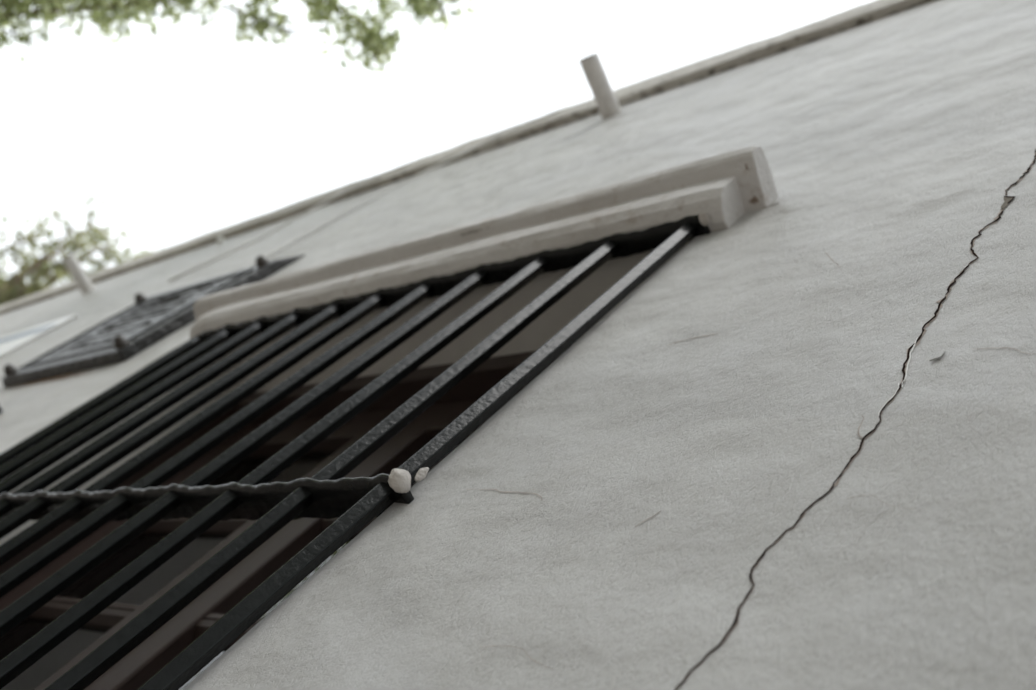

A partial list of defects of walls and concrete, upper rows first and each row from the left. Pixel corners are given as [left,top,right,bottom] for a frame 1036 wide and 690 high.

crack [675,150,1036,690]